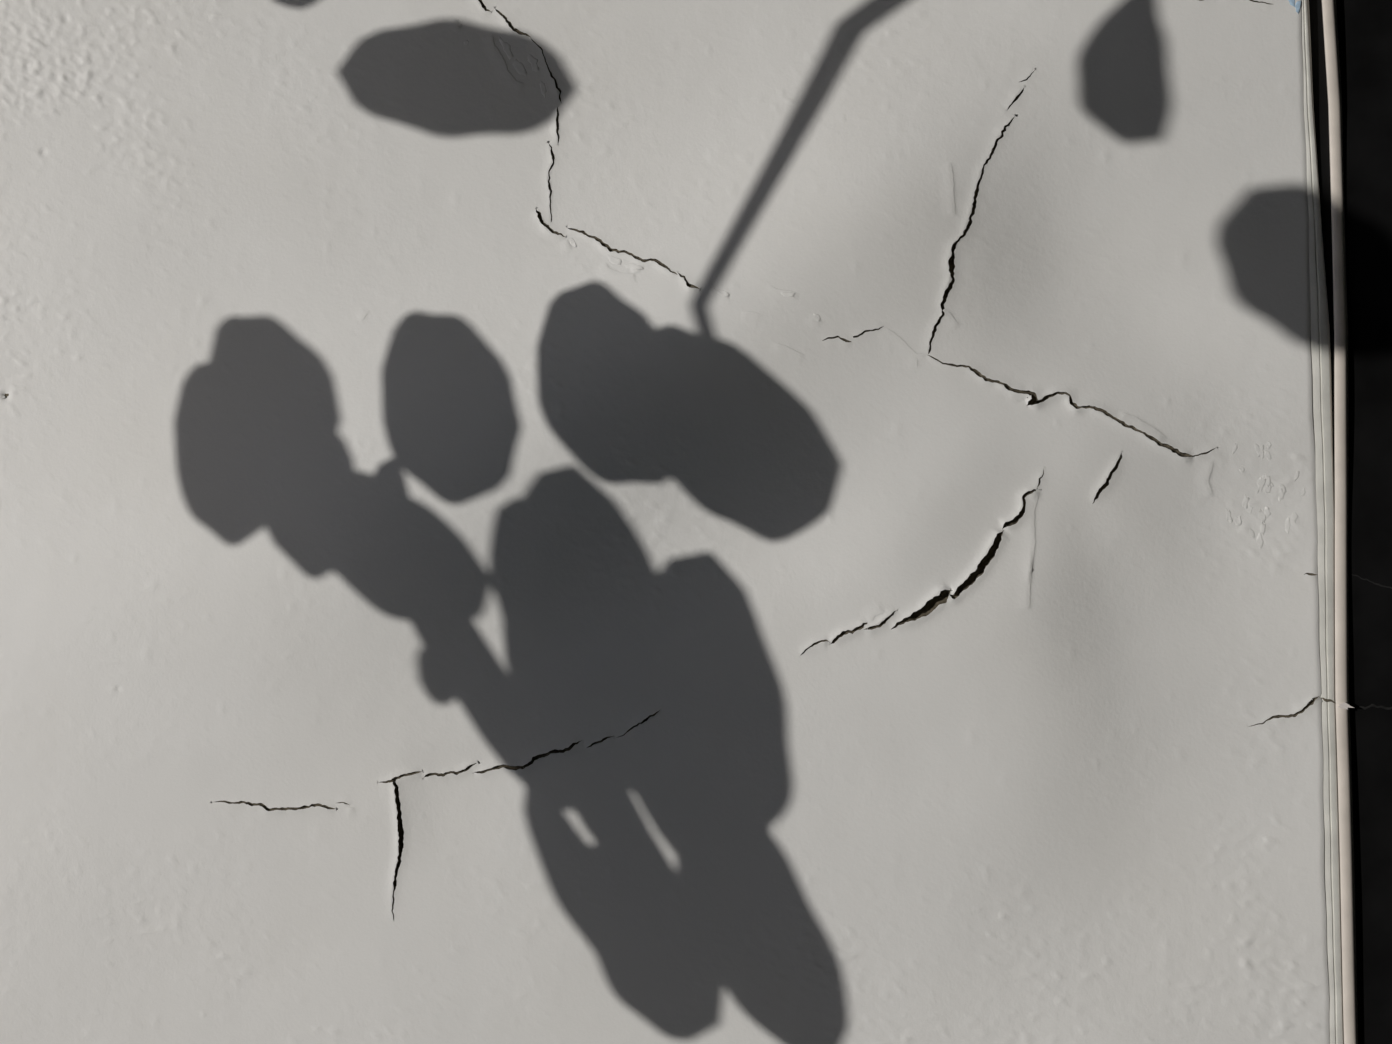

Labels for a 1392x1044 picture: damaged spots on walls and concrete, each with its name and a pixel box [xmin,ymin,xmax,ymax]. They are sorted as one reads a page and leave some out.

crack [456,0,1219,507]
crack [798,467,1048,659]
crack [212,707,662,923]
crack [1247,693,1335,731]